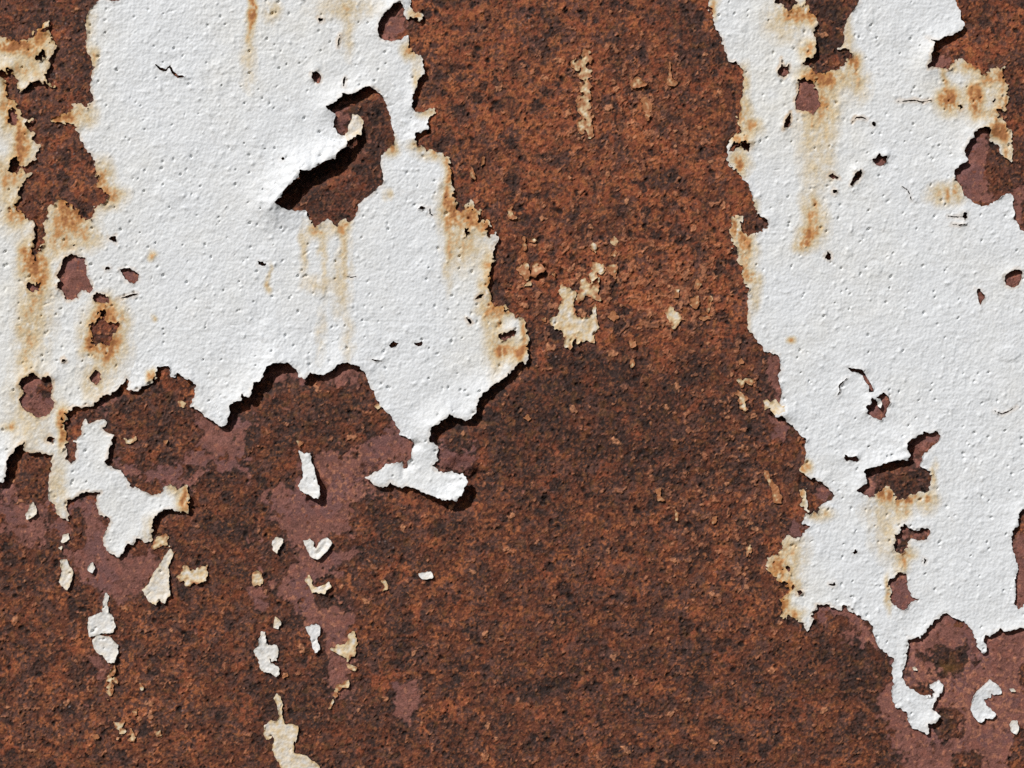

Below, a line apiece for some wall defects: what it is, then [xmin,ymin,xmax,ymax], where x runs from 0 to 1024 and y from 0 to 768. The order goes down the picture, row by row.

peeling [8,107,18,126]
peeling [8,156,23,174]
rust [0,0,126,372]
rust [776,0,861,138]
rust [919,0,1024,231]
rust [375,0,835,768]
rust [853,429,940,516]
peeling [0,347,473,768]
peeling [804,604,1024,768]